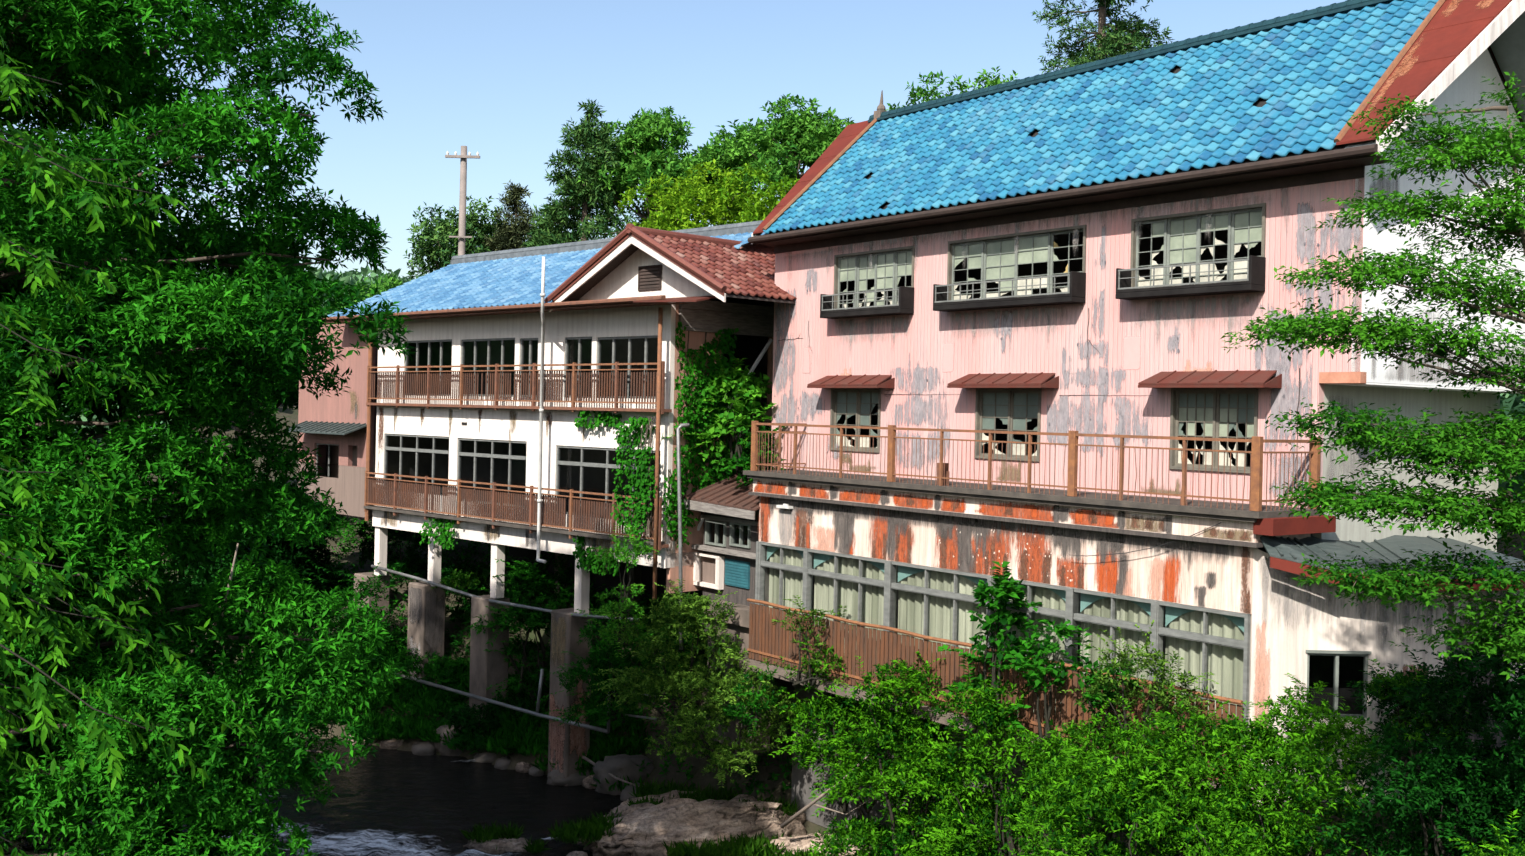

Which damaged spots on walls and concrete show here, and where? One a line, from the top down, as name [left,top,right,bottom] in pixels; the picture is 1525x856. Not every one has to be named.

corrosion [1364,39,1423,116]
peeling [1095,225,1106,269]
corrosion [843,451,875,472]
peeling [892,353,950,472]
corrosion [998,460,1020,481]
peeling [1045,289,1152,457]
peeling [1255,201,1360,499]
corrosion [754,480,1181,603]
leakage [1255,558,1336,729]